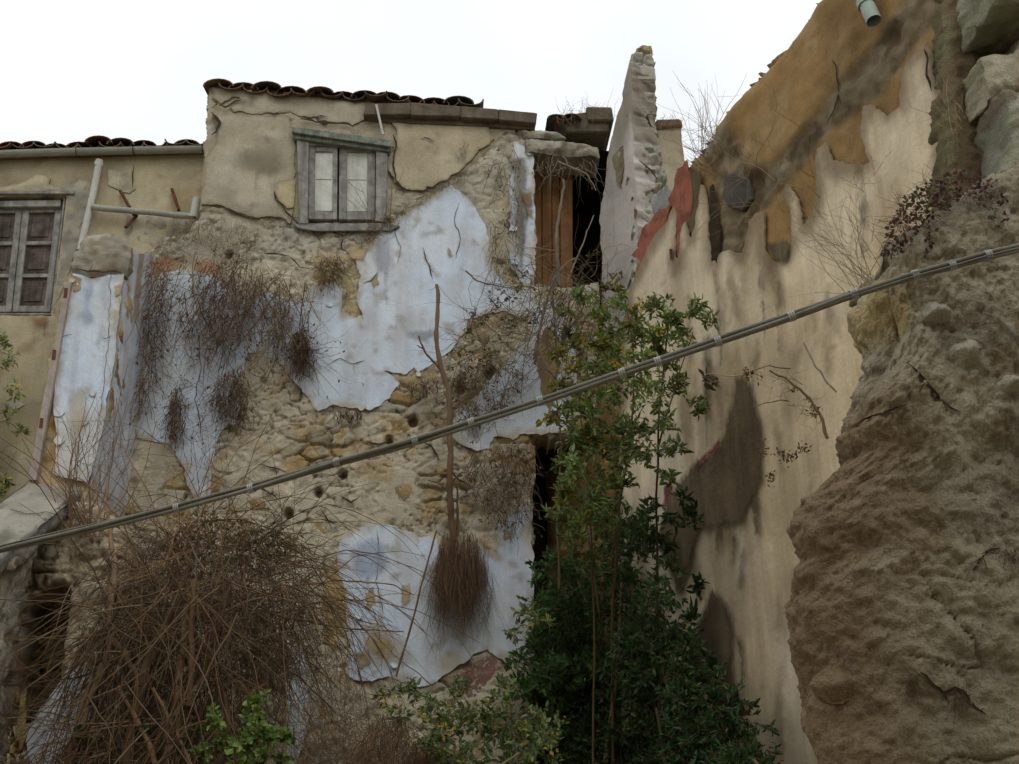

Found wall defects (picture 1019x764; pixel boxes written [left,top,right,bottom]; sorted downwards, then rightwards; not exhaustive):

peeling [53,180,124,483]
peeling [135,141,577,498]
spalling [631,160,721,262]
spalling [767,240,789,262]
spalling [395,484,414,501]
peeling [321,501,535,698]